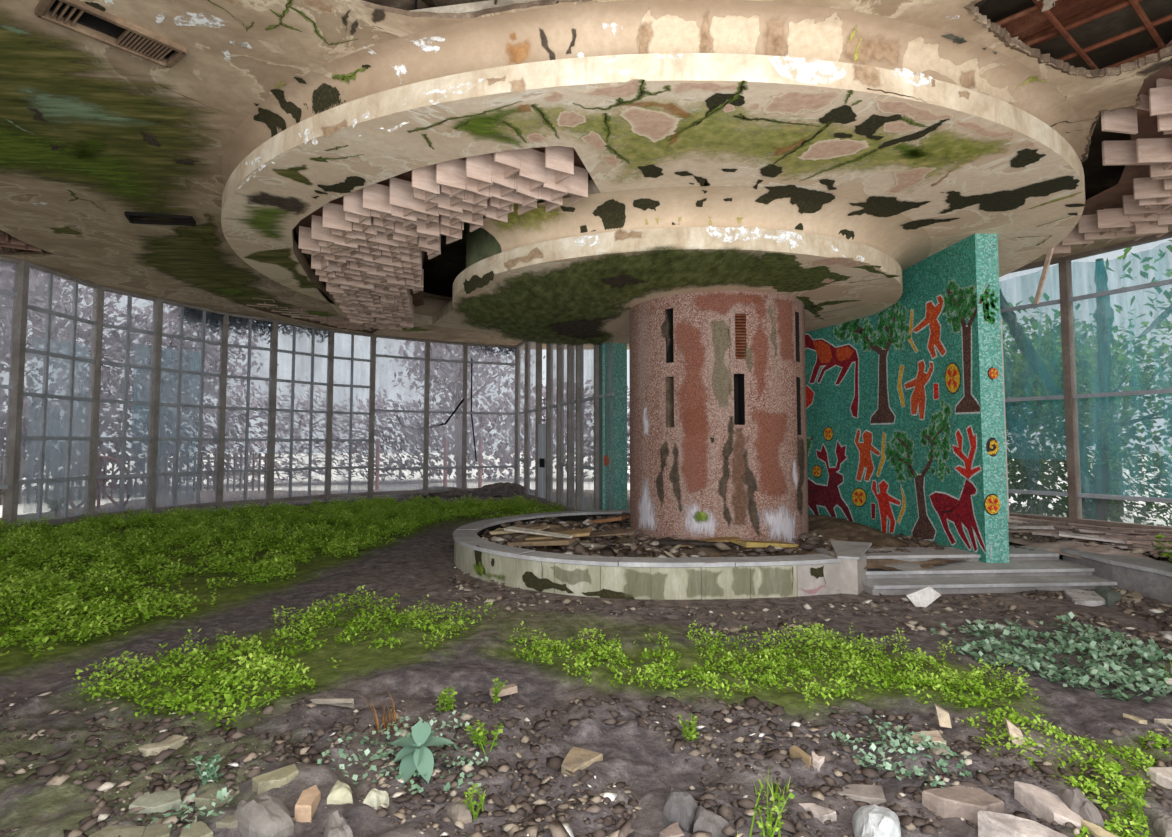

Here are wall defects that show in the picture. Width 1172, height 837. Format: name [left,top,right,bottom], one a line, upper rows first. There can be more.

peeling [411,37,445,52]
peeling [637,10,760,59]
peeling [786,13,844,62]
water stain [488,77,525,93]
peeling [902,0,1172,163]
water stain [322,120,347,137]
spalling [638,164,710,207]
water stain [615,218,658,240]
spalling [808,167,1079,283]
water stain [505,248,543,270]
water stain [639,416,805,543]